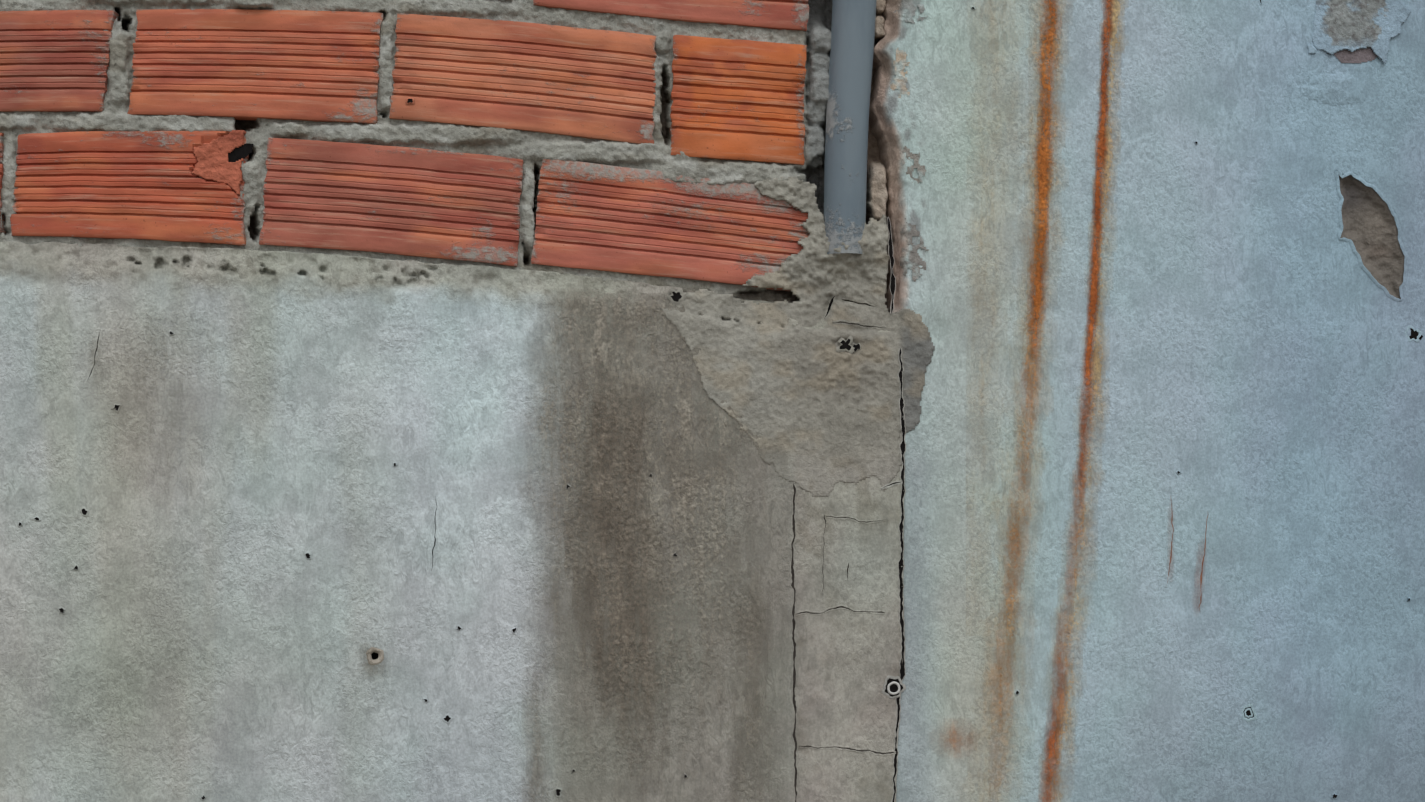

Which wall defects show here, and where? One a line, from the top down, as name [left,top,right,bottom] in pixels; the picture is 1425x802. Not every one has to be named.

spalling [191,130,254,195]
corrosion [1026,0,1060,389]
corrosion [1076,0,1120,544]
peeling [1307,0,1411,64]
spalling [1335,170,1408,302]
leakage [539,291,761,798]
crack [789,217,906,802]
corrosion [1046,617,1075,802]